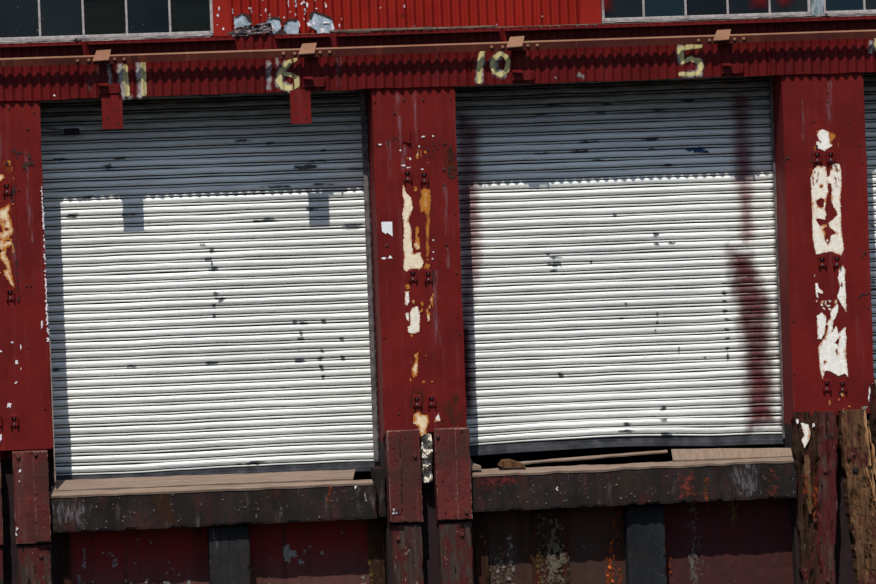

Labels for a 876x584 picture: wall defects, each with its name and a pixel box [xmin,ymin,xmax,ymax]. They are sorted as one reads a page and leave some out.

peeling [814,130,840,151]
peeling [0,203,15,287]
peeling [402,185,434,272]
peeling [810,164,848,379]
peeling [404,284,434,337]
peeling [410,350,433,383]
peeling [413,412,440,437]
peeling [283,543,324,565]
rust [605,506,622,584]